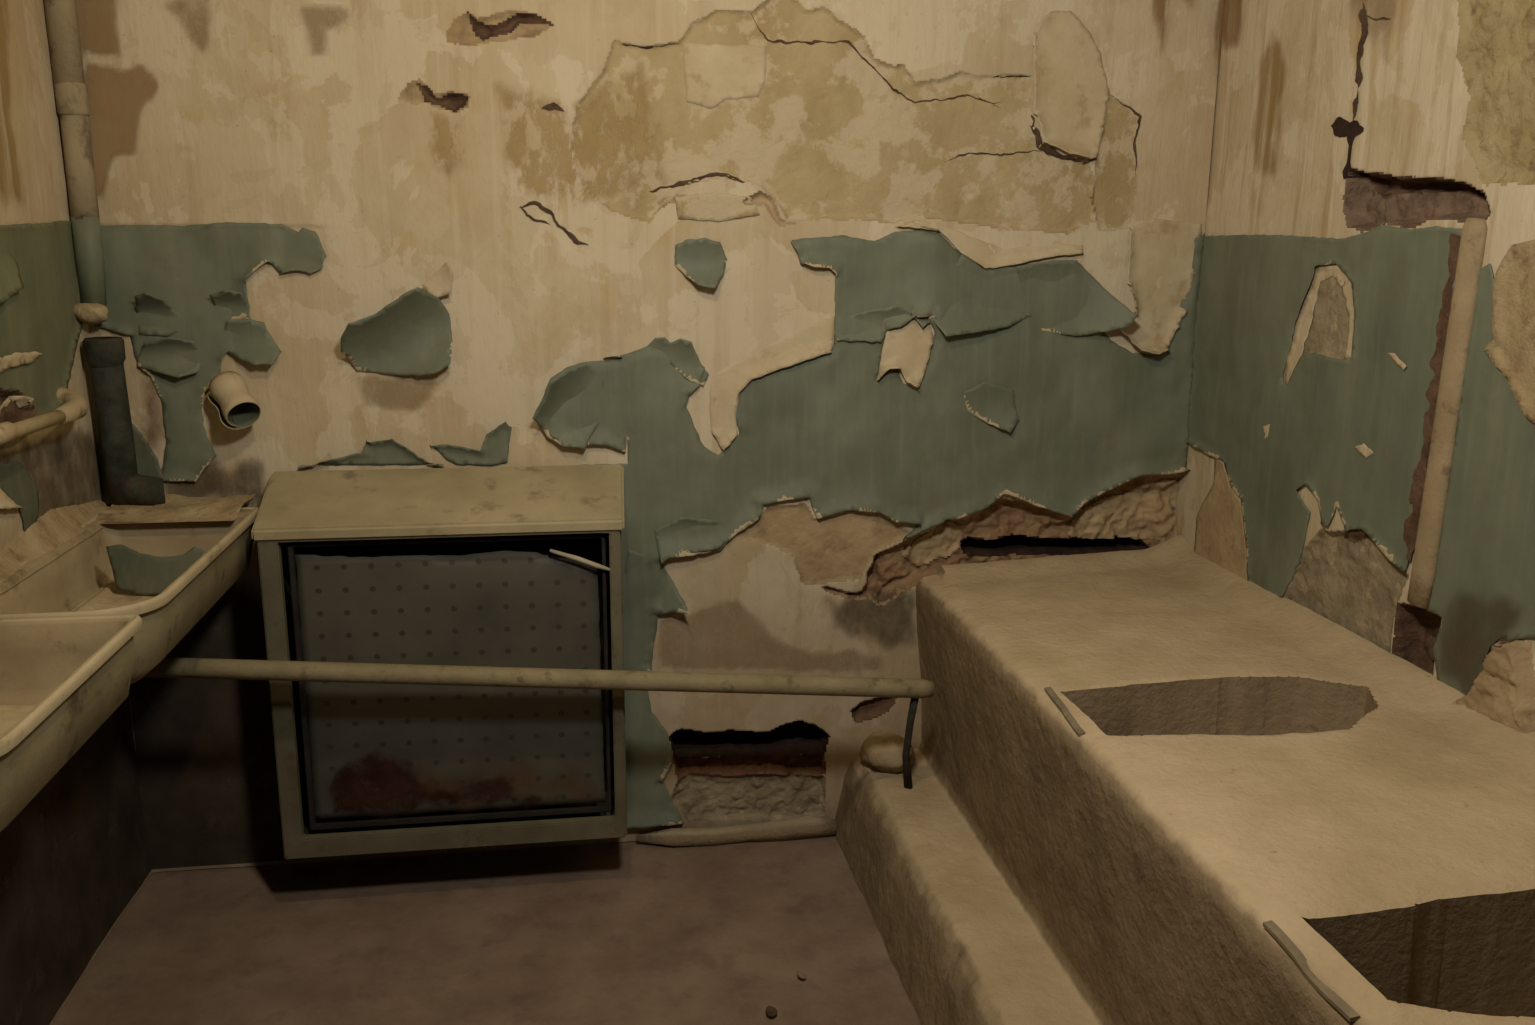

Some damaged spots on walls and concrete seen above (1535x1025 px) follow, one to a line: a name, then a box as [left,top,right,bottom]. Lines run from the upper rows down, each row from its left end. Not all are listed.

flaking render [446,10,554,46]
crack [542,102,564,112]
crack [1331,2,1390,179]
crack [519,201,588,245]
peeling [0,220,326,482]
peeling [340,261,454,376]
peeling [532,0,1535,733]
peeling [0,444,39,532]
peeling [106,544,206,596]
flaking render [625,690,831,829]